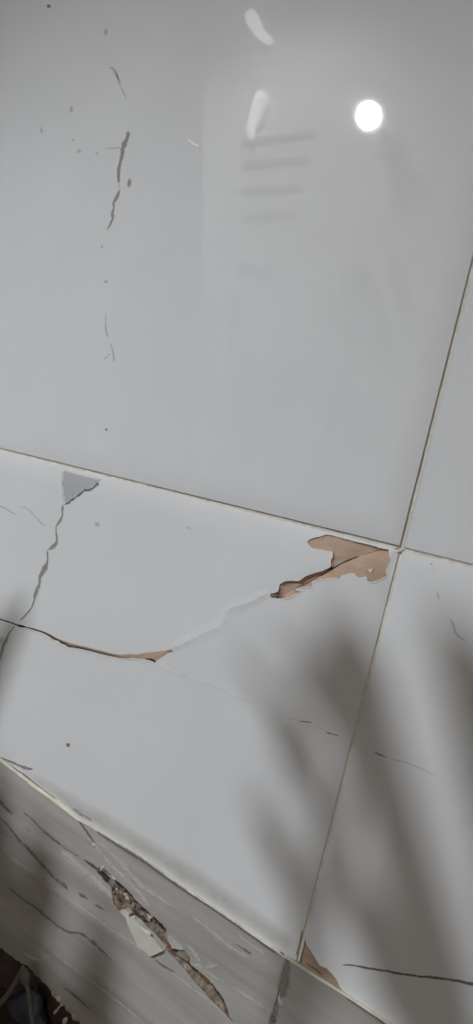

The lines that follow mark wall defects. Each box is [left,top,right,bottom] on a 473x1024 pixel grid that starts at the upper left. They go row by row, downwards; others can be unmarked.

crack [0,506,271,664]
spalling [271,535,390,600]
spalling [280,931,343,991]